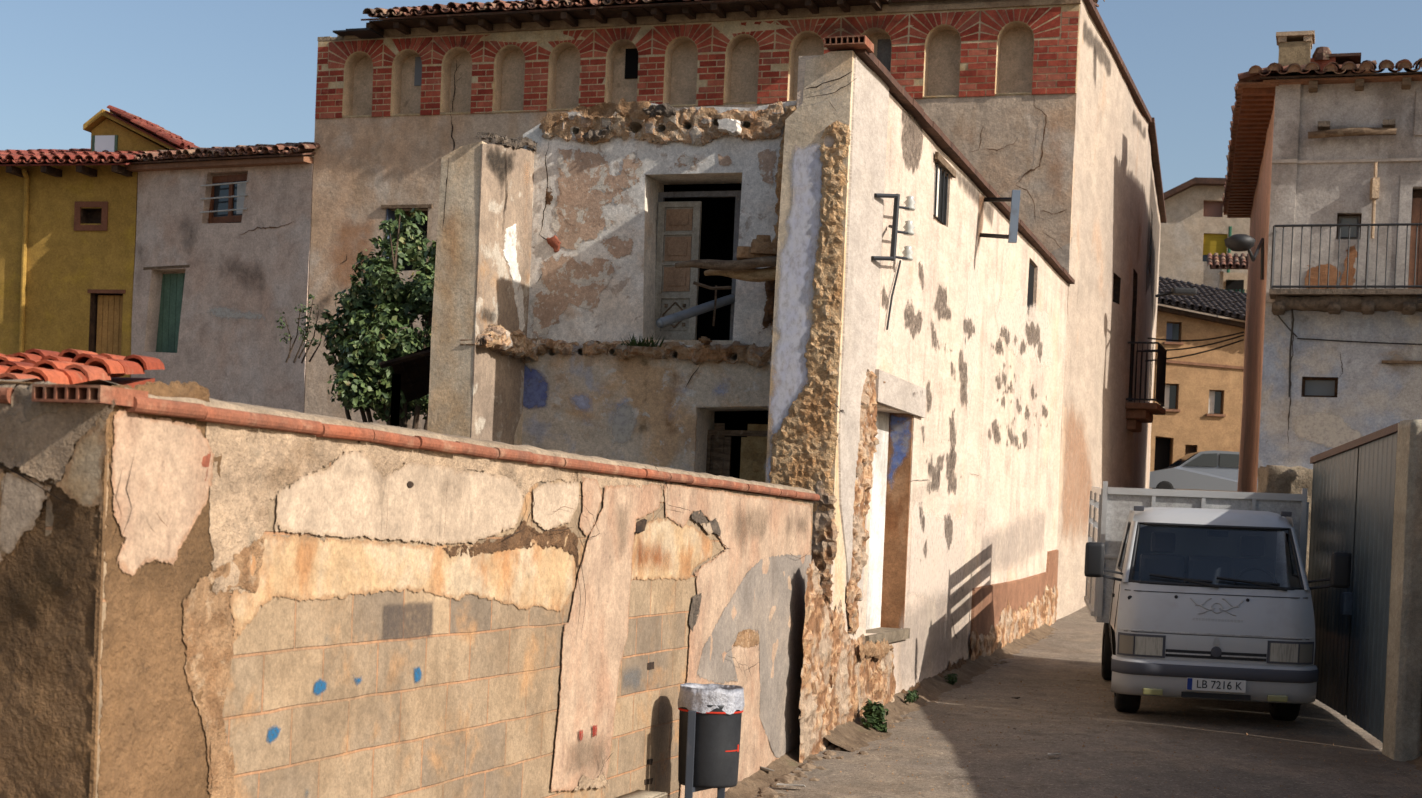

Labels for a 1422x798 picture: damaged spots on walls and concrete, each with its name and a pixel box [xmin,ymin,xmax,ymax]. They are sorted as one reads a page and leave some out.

crack [443,60,461,223]
peeling [503,98,677,340]
peeling [758,149,777,188]
crack [969,95,1065,250]
spalling [762,280,775,330]
peeling [881,201,1051,602]
flaking render [0,408,214,576]
flaking render [182,450,603,798]
flaking render [631,510,722,581]
spalling [689,593,702,631]
spalling [733,629,760,648]
flaking render [846,369,894,663]